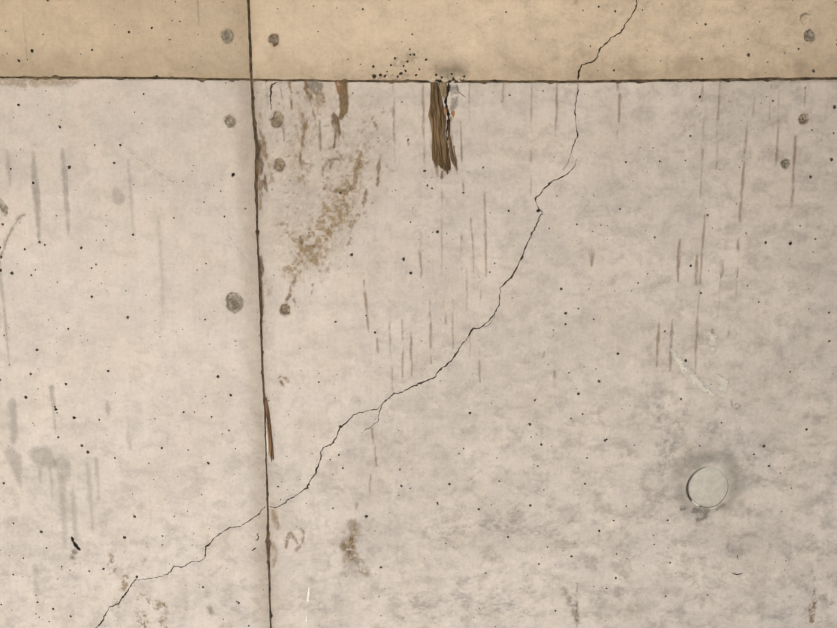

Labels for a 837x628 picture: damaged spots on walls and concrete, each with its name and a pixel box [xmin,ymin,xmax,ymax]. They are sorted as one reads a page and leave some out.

corrosion [332,79,348,148]
corrosion [284,152,362,305]
crack [96,0,637,628]